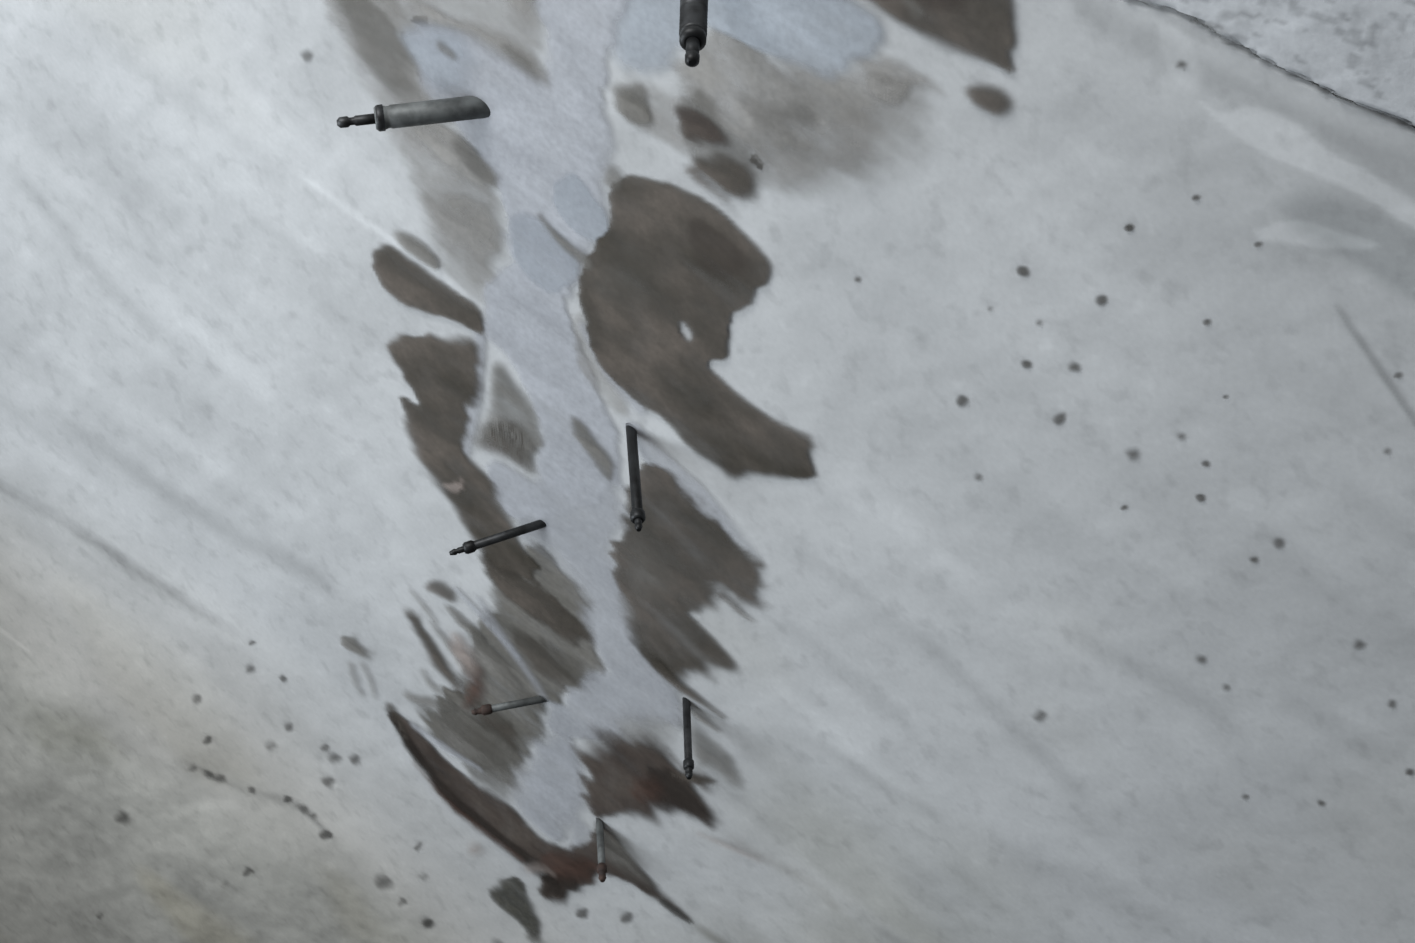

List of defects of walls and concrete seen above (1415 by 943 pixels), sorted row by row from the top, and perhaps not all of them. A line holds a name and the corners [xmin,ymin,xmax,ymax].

damp [372,0,1013,938]